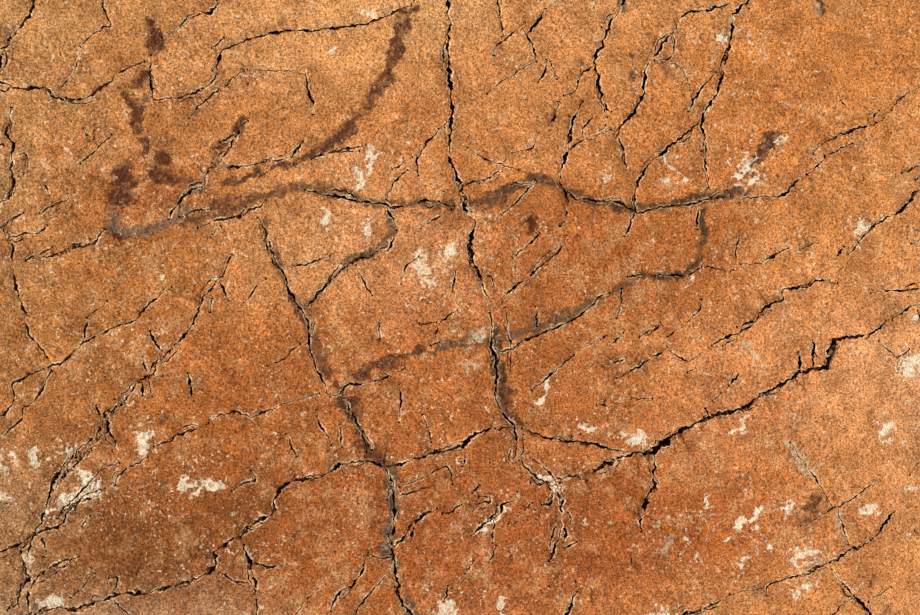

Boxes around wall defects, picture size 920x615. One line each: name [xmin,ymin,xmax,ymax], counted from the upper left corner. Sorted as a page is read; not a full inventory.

crack [487,0,559,95]
crack [547,0,758,236]
crack [739,84,920,203]
crack [0,0,417,440]
crack [257,0,541,398]
crack [501,235,568,302]
crack [655,236,818,279]
crack [837,164,920,256]
crack [878,340,910,360]
crack [871,281,920,294]
crack [892,303,920,322]
crack [0,254,896,615]